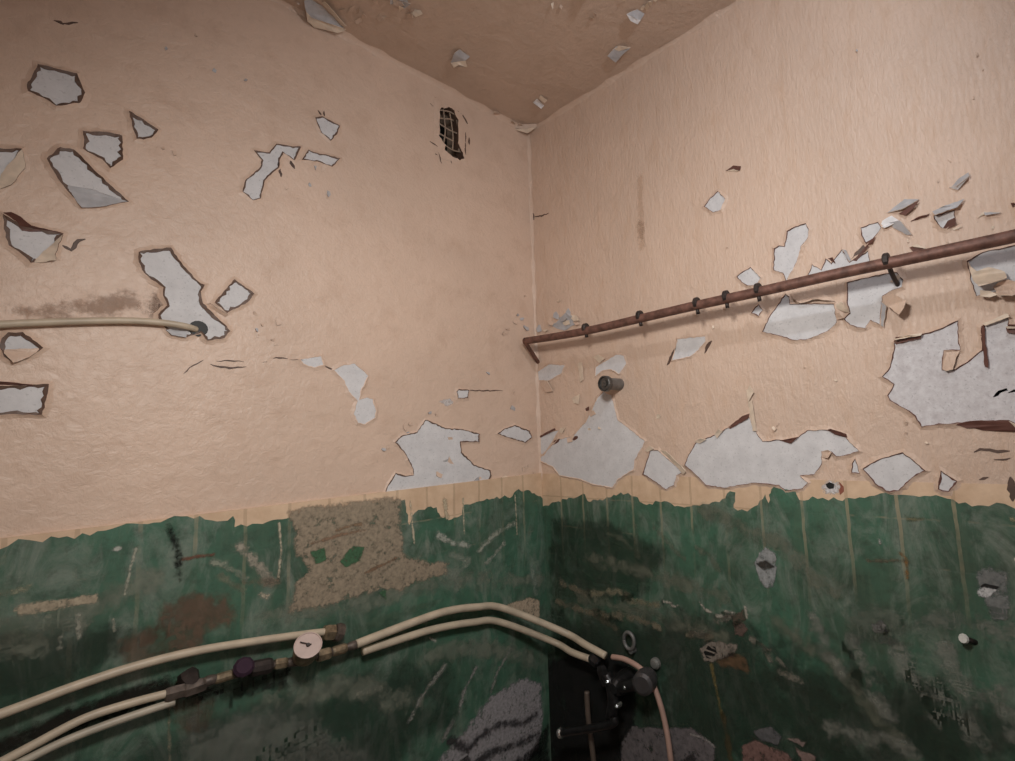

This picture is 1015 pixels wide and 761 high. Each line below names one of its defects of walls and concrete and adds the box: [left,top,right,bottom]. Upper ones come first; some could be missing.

peeling [304,0,346,33]
peeling [21,59,92,111]
peeling [0,107,177,211]
peeling [0,210,86,268]
peeling [133,245,282,345]
peeling [734,172,969,345]
peeling [962,243,1015,301]
peeling [0,328,50,366]
peeling [667,325,714,365]
peeling [0,379,55,419]
peeling [877,313,1015,443]
peeling [287,352,964,613]